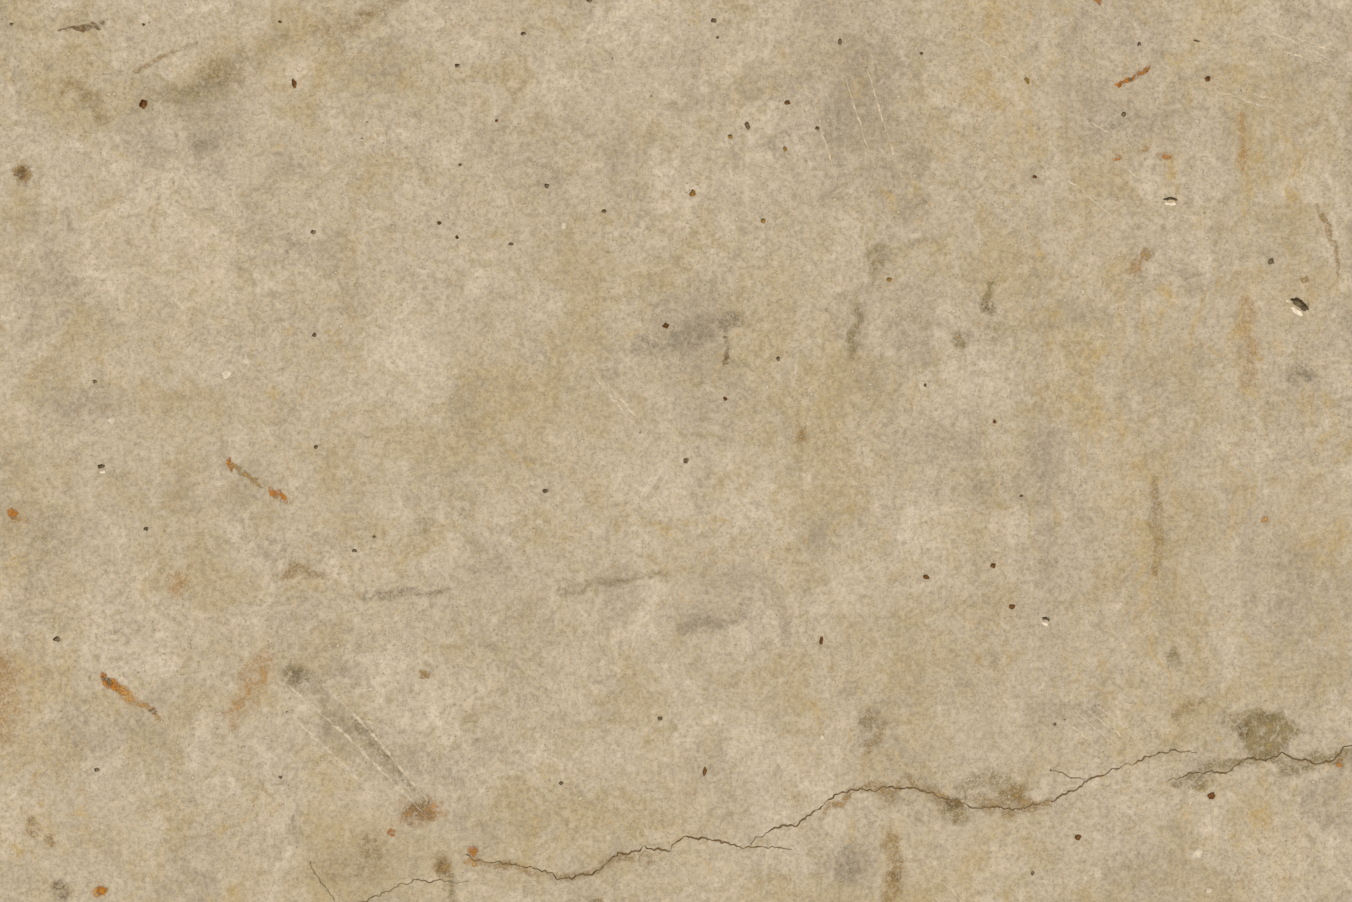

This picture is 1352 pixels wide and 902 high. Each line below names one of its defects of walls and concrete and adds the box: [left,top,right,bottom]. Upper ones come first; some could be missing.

corrosion [1115,65,1151,88]
corrosion [226,457,288,502]
corrosion [100,672,157,717]
leakage [1239,710,1299,757]
crack [309,743,1352,902]